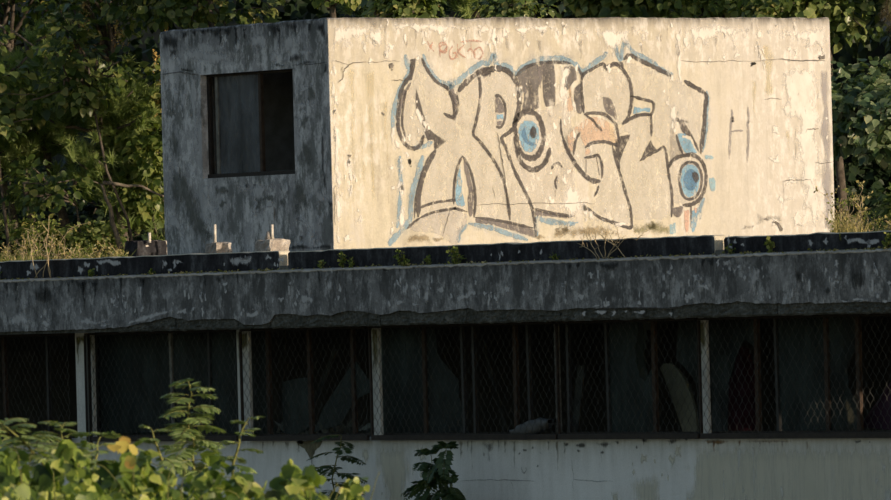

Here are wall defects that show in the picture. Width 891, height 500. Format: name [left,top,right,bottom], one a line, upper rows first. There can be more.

water stain [164,27,246,55]
peeling [334,19,567,71]
peeling [598,30,627,73]
peeling [662,21,770,133]
peeling [783,22,825,60]
peeling [784,69,832,226]
water stain [175,176,212,240]
peeling [845,236,879,247]